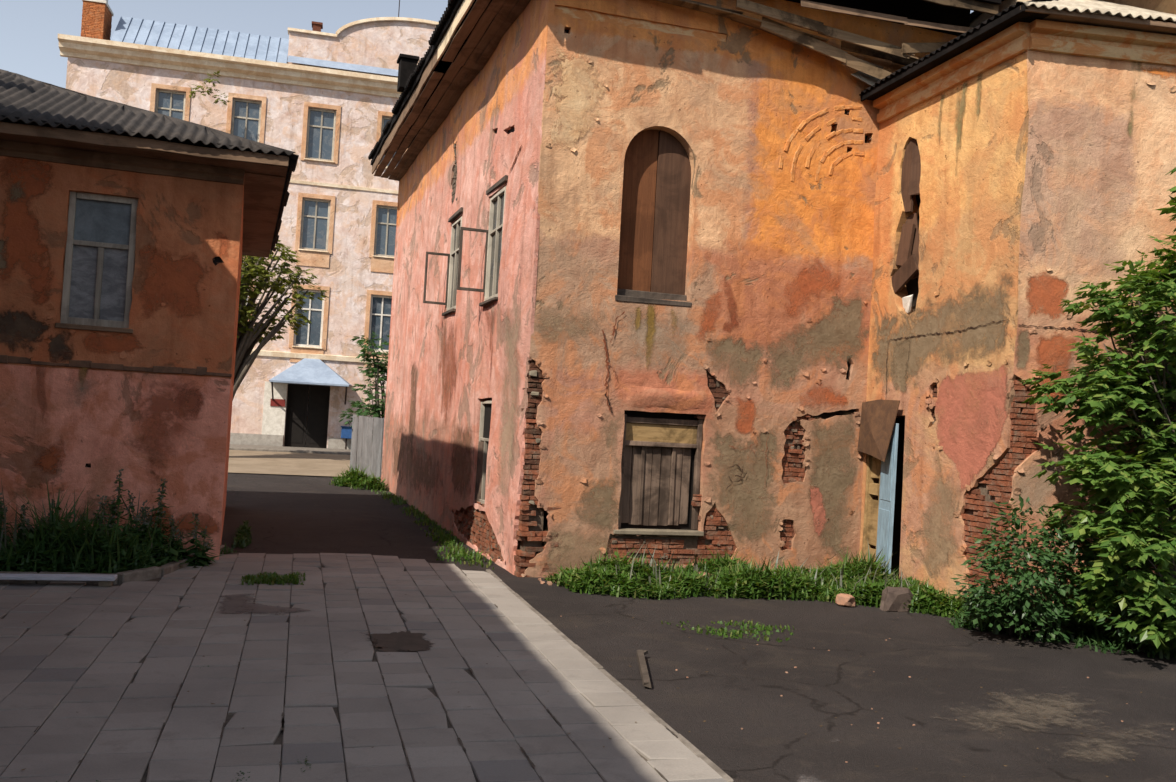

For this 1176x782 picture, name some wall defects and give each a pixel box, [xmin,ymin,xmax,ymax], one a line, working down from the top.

crack [602,311,625,413]
crack [799,409,856,419]
flaking render [449,359,561,585]